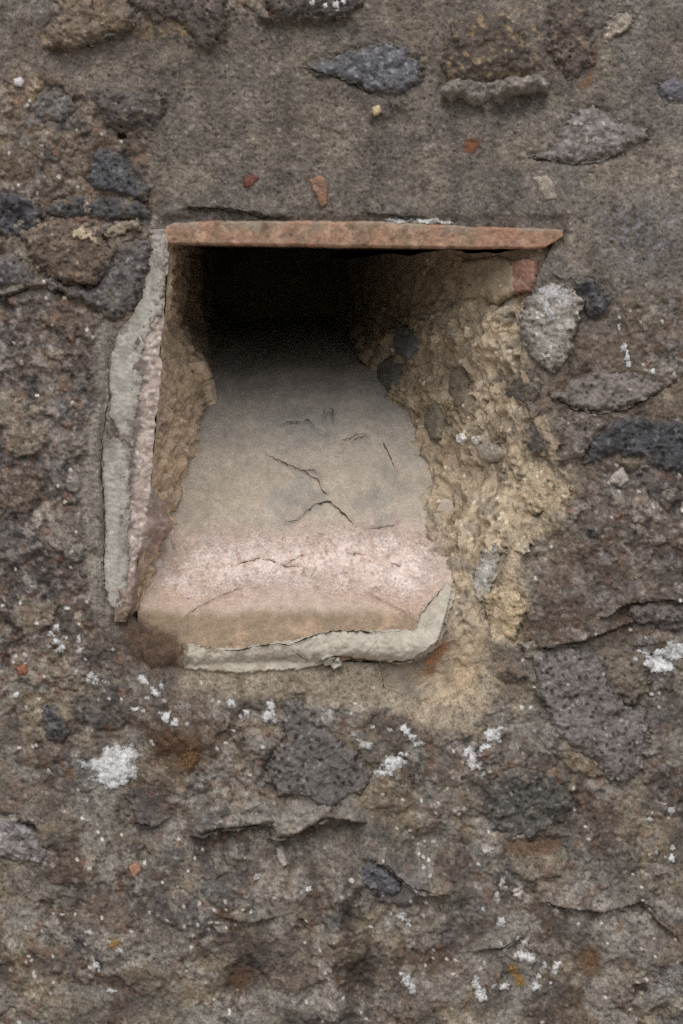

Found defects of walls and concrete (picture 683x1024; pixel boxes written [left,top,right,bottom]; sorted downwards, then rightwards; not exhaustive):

peeling [101,238,170,611]
crack [283,407,395,468]
crack [268,455,397,529]
spalling [158,247,552,703]
crack [187,555,309,615]
crack [543,624,628,647]